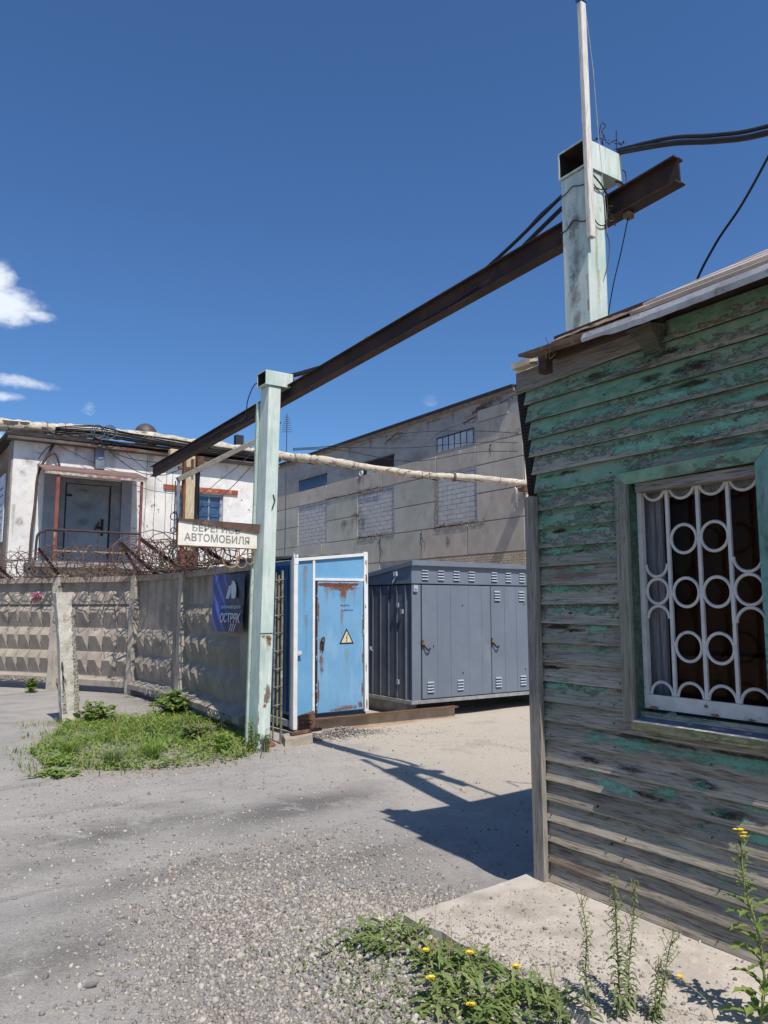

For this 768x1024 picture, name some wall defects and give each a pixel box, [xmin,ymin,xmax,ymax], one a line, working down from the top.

peeling [538,357,720,433]
peeling [609,385,768,458]
rust [318,562,367,621]
peeling [664,711,752,736]
peeling [586,731,768,776]